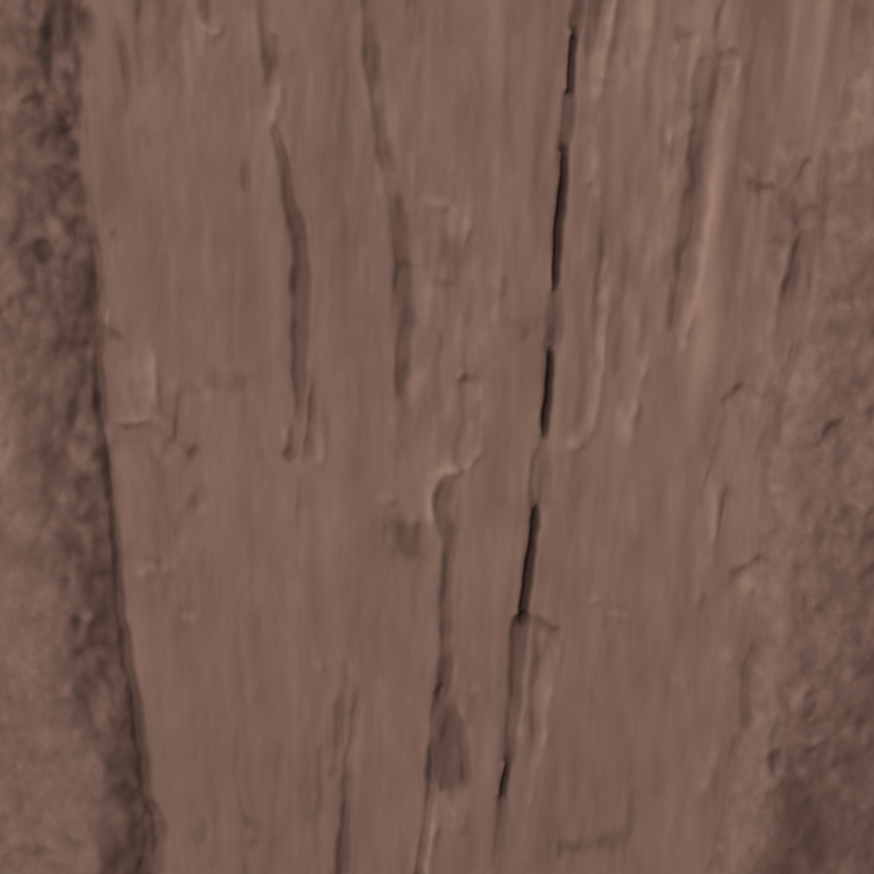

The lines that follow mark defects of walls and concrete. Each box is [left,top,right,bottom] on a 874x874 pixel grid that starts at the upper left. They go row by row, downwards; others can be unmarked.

crack [491,0,587,874]